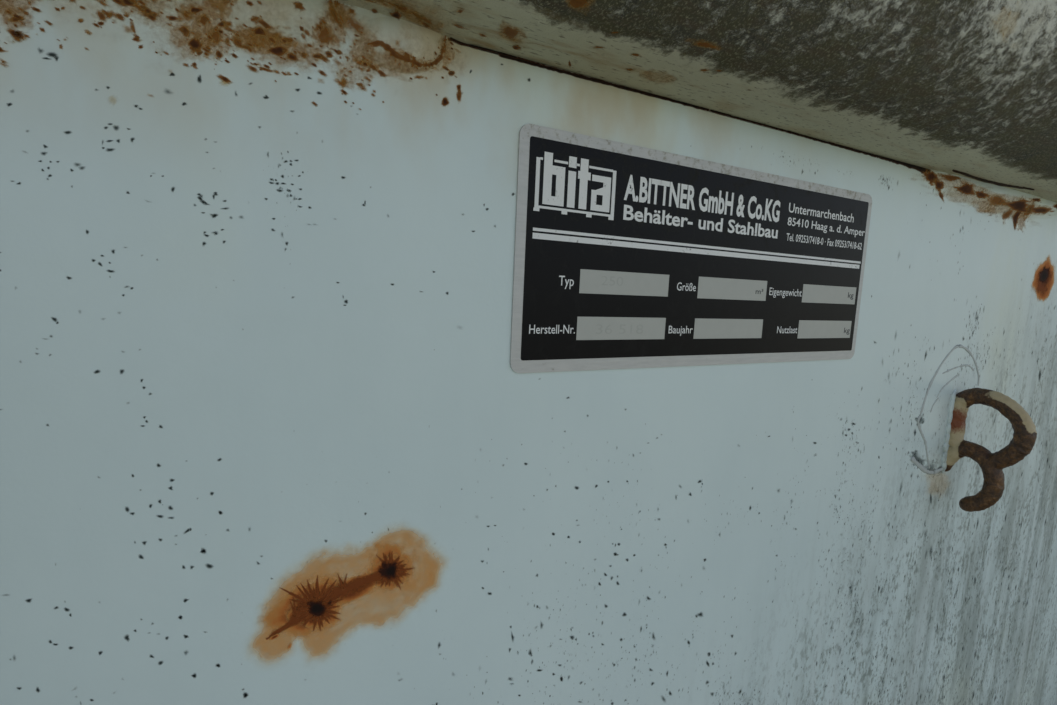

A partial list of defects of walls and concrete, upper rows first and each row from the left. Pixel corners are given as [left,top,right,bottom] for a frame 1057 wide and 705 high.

rust [0,0,52,66]
rust [55,0,1057,230]
rust [1032,258,1054,301]
rust [254,531,440,659]